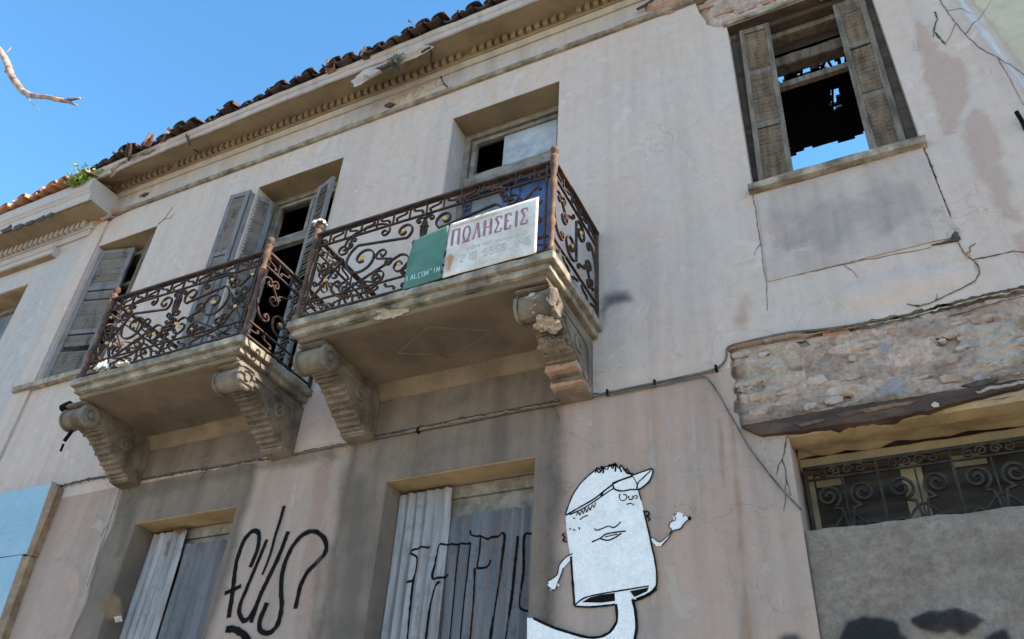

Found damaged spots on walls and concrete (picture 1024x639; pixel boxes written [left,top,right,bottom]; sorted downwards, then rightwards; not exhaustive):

spalling [636,0,787,27]
crack [933,0,1024,105]
crack [752,195,768,311]
crack [795,148,1024,335]
flaking render [517,292,591,394]
spalling [730,293,1024,426]